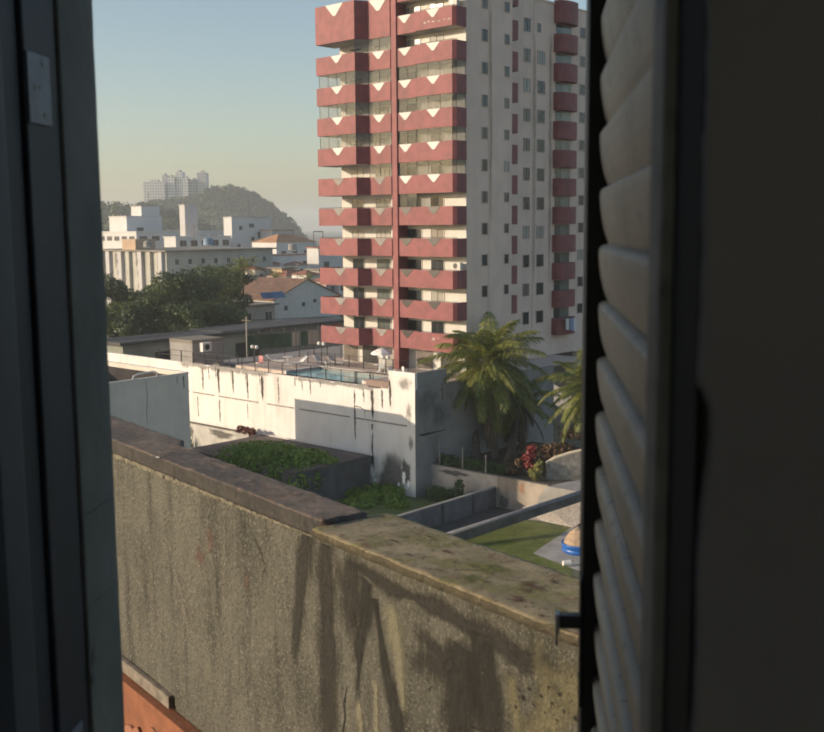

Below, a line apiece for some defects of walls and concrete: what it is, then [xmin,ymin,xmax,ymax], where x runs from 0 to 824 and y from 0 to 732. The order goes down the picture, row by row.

water stain [294,377,410,492]
water stain [292,531,546,732]